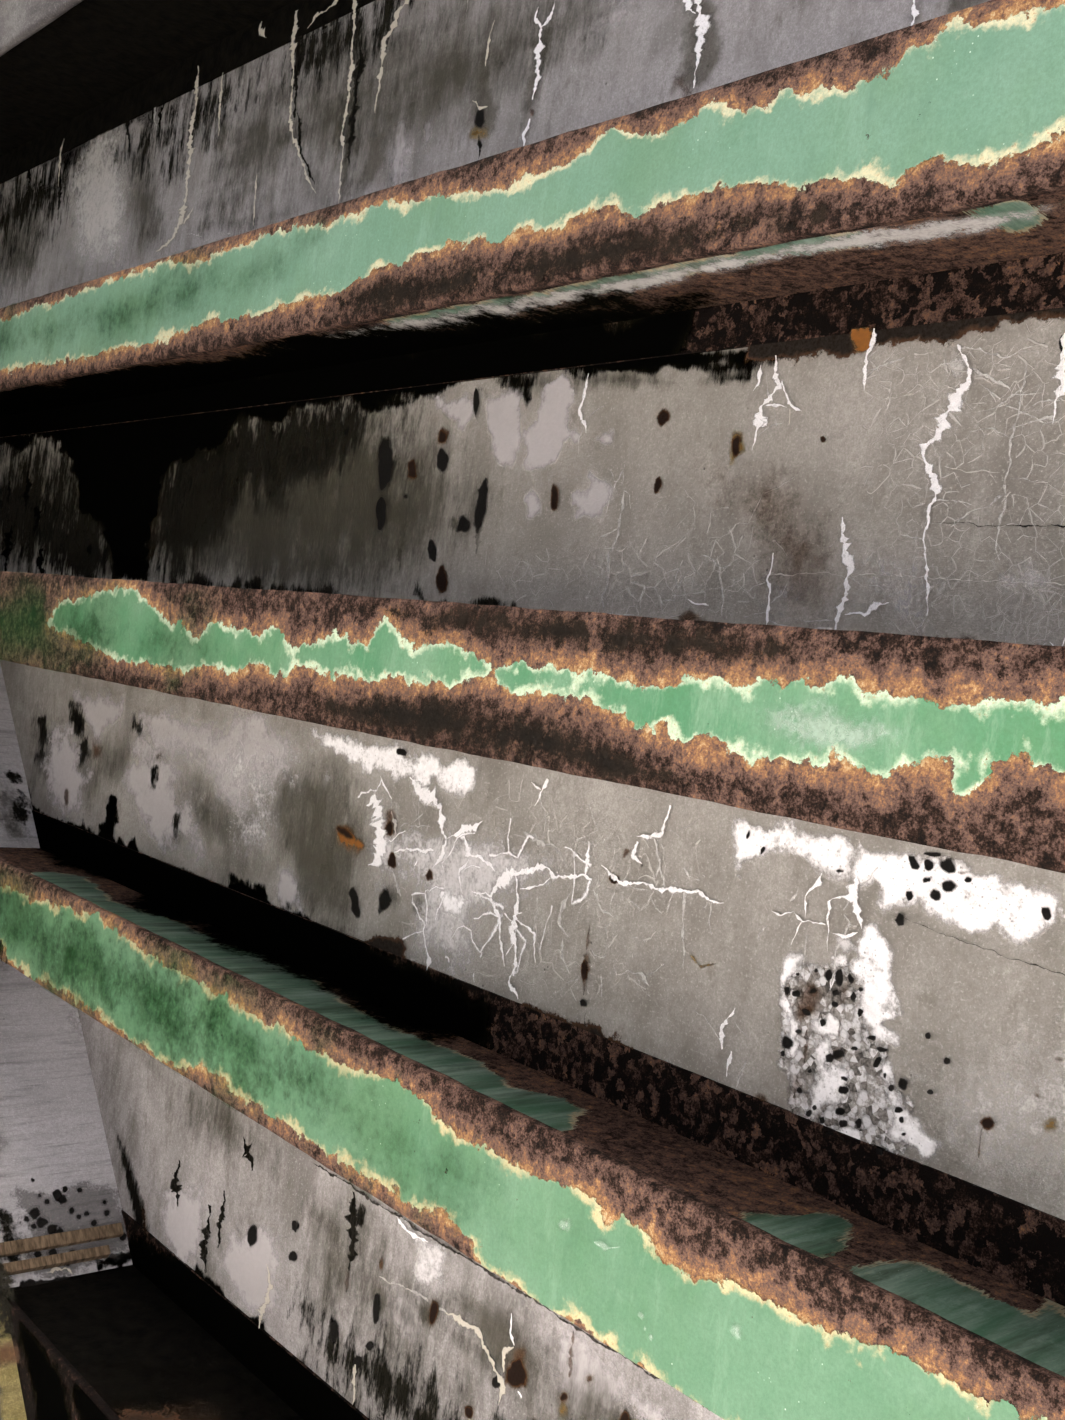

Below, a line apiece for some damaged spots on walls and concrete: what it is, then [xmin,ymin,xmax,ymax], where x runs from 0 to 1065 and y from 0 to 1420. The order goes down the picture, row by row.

peeling [0,3,1065,375]
crack [676,0,711,94]
leakage [0,203,832,600]
rust [657,409,670,427]
crack [485,319,1065,645]
rust [745,307,1065,366]
peeling [47,585,1065,796]
leakage [0,692,691,1050]
rust [385,810,397,868]
crack [358,777,720,1001]
leakage [117,1135,462,1420]
peeling [0,870,1065,1420]